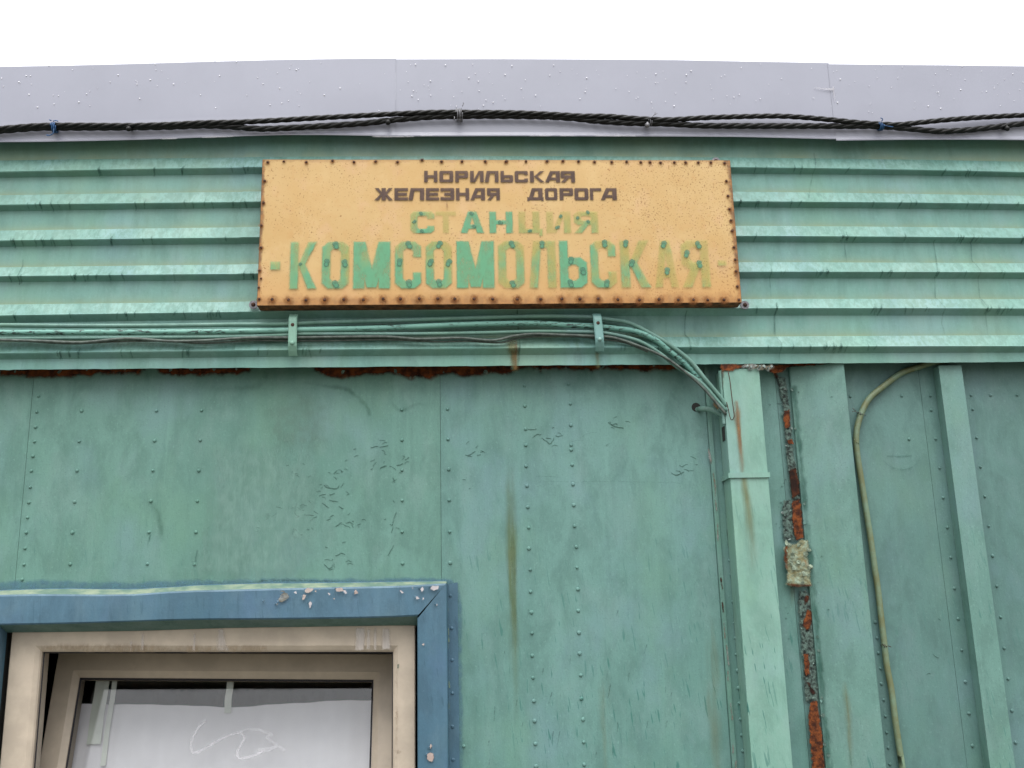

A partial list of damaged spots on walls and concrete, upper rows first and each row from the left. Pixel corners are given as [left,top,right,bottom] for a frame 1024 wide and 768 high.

corrosion [0,369,145,378]
corrosion [158,368,250,376]
corrosion [769,363,836,386]
corrosion [783,410,794,444]
corrosion [789,468,804,540]
peeling [262,588,358,607]
corrosion [803,595,812,629]
corrosion [803,654,825,768]